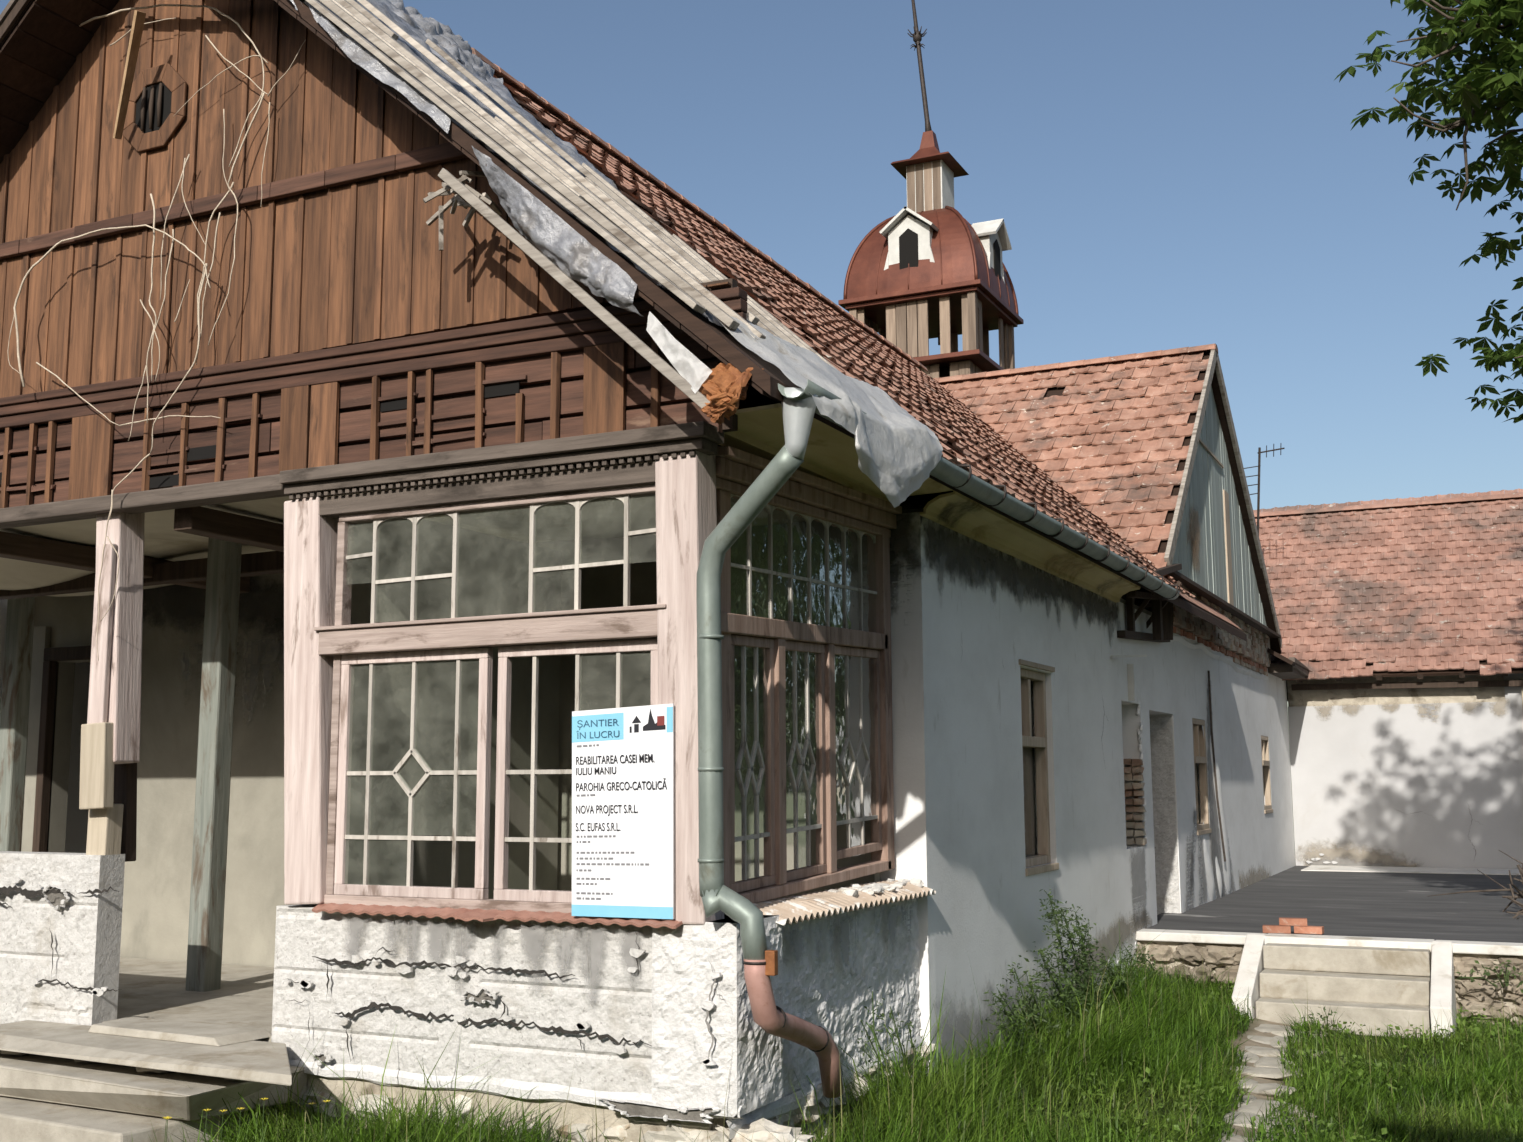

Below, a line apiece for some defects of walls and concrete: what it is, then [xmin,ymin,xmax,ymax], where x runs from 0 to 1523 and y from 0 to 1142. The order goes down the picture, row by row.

water stain [889,504,1119,640]
flaking render [42,885,70,910]
crack [0,877,122,997]
crack [627,931,647,973]
crack [284,946,651,1062]
flaking render [460,988,500,1004]
flaking render [311,1052,333,1067]
flaking render [596,1097,720,1124]